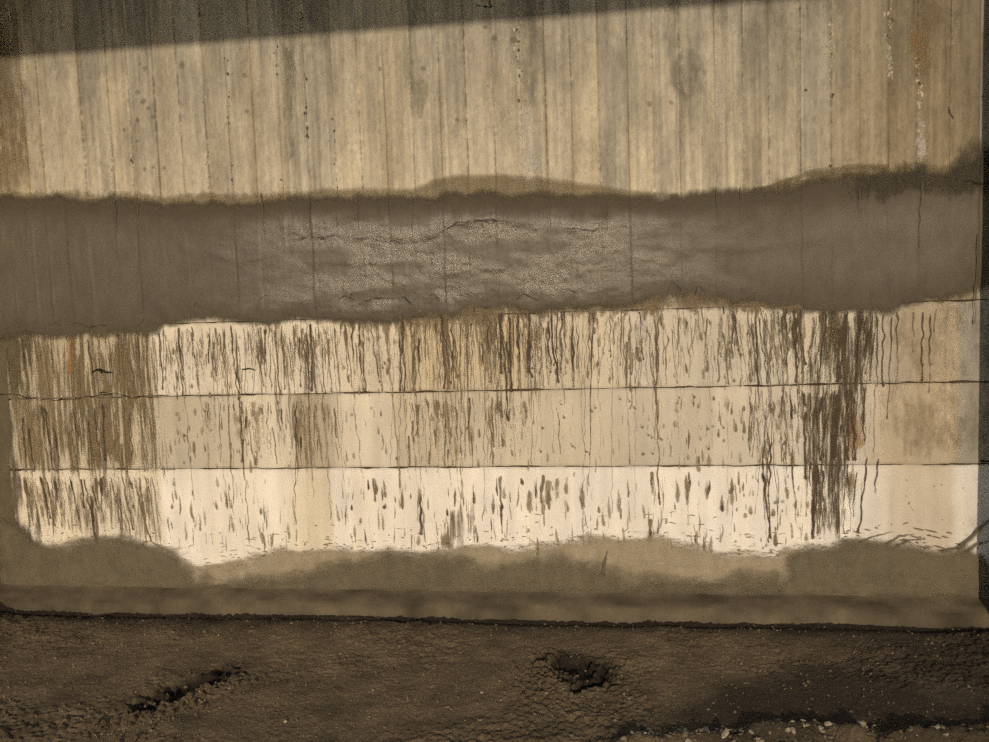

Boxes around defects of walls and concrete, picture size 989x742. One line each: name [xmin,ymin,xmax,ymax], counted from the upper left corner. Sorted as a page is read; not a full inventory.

damp [3,307,899,547]
damp [912,309,937,392]